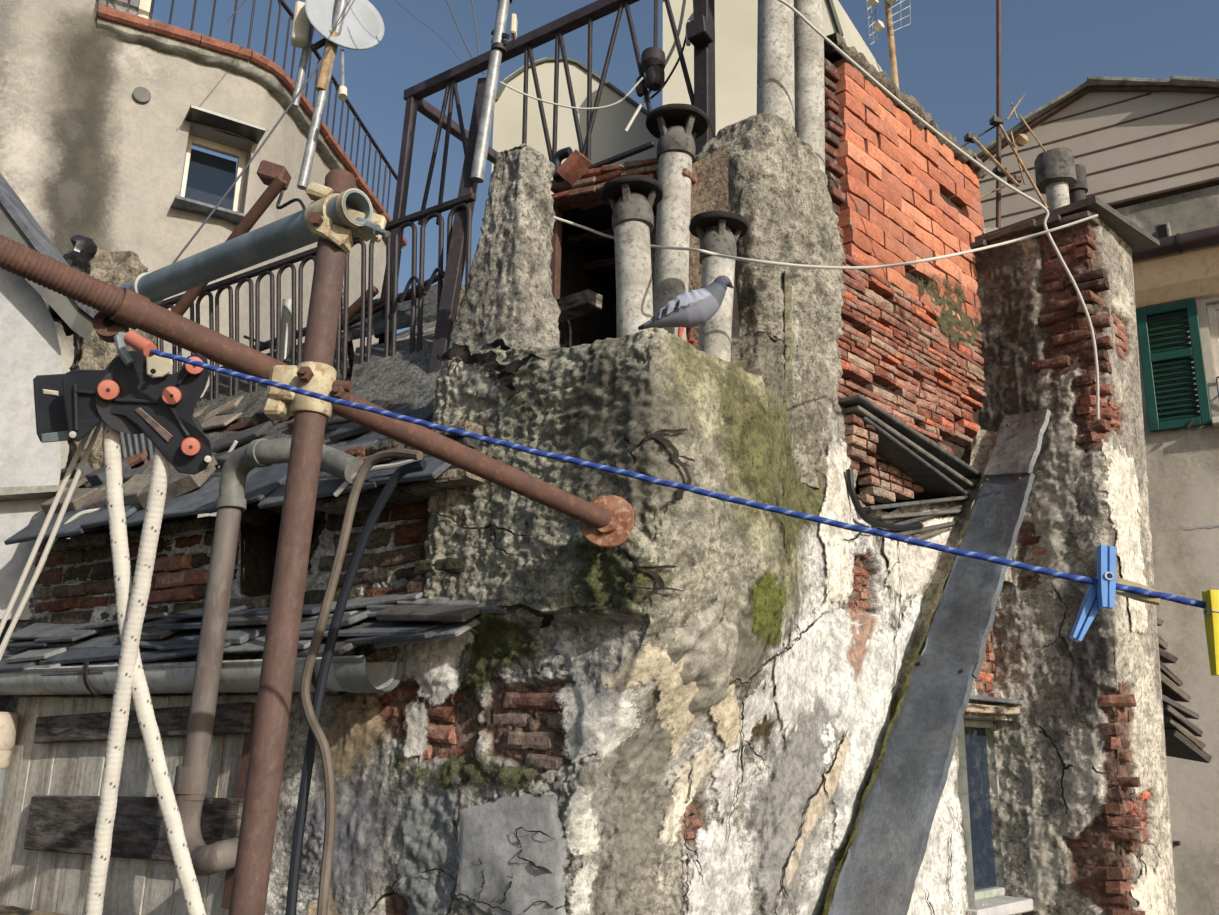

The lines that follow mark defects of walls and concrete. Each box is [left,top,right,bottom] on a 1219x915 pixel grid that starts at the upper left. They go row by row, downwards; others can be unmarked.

leakage [0,1,166,256]
crack [623,428,695,514]
flaking render [1032,227,1147,586]
peeling [379,622,477,759]
crack [360,785,567,915]
peeling [493,438,955,915]
flaking render [1067,681,1167,915]
peeling [1128,598,1148,633]